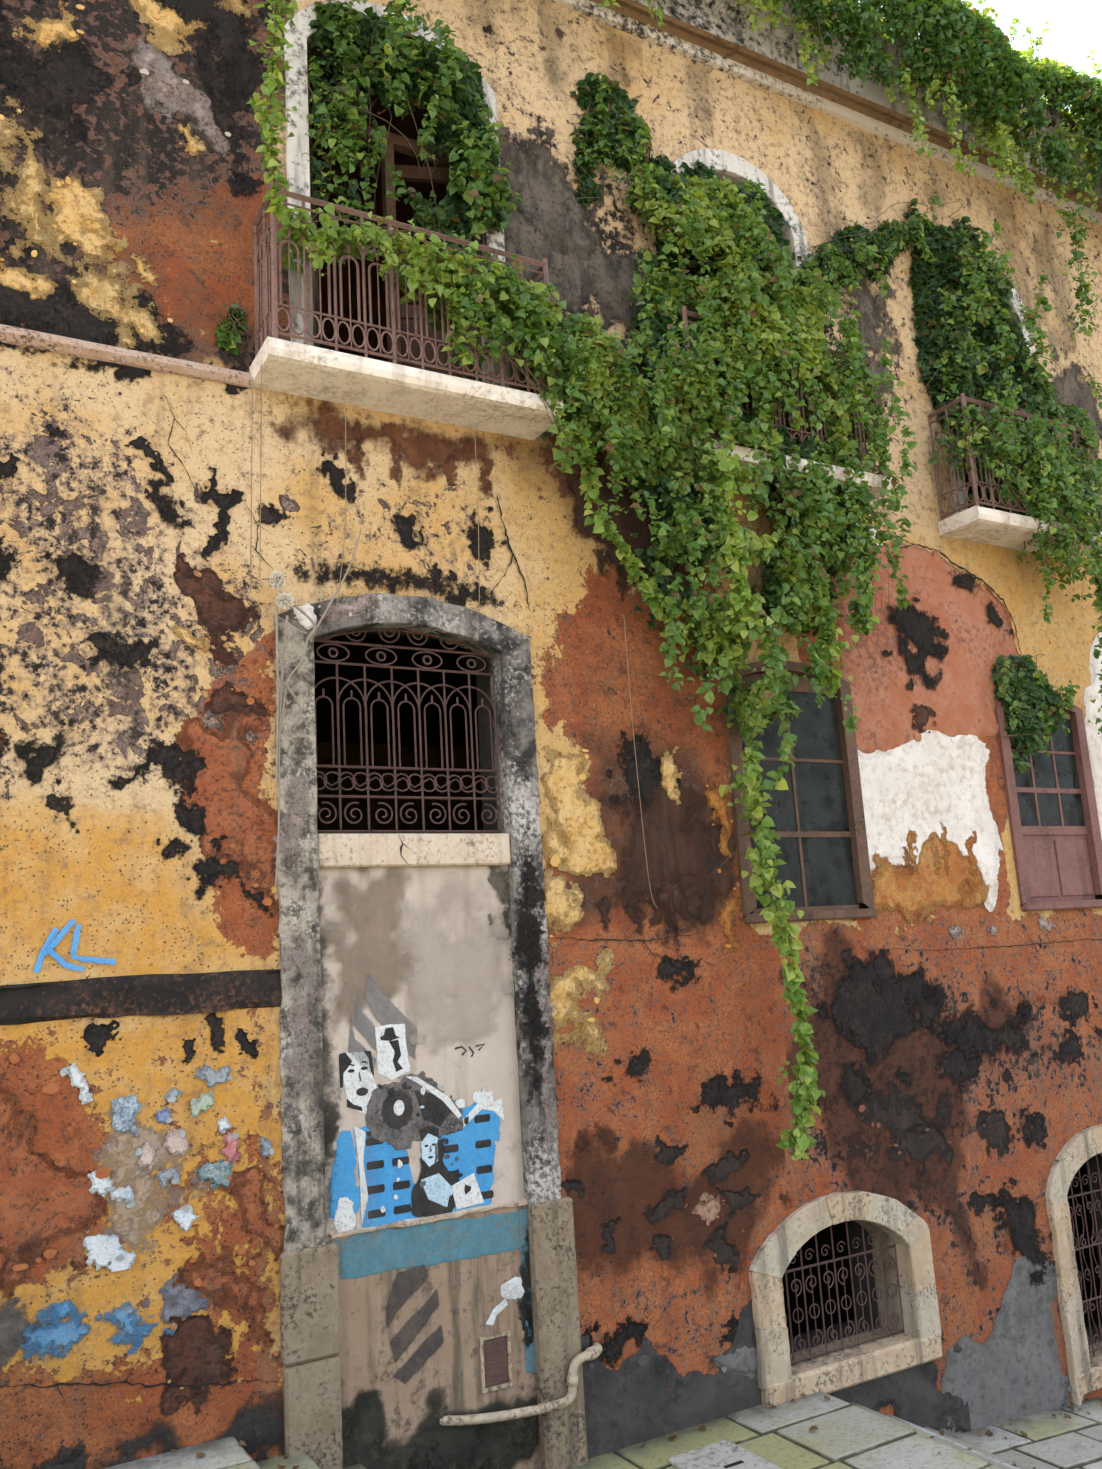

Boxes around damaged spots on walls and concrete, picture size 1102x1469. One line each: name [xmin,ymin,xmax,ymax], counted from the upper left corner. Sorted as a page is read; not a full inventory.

water stain [0,0,273,197]
peeling [0,96,173,349]
water stain [0,266,208,383]
spalling [0,452,31,479]
water stain [0,719,80,833]
water stain [107,737,274,918]
peeling [535,712,617,1146]
water stain [594,730,736,994]
rust [871,822,989,924]
peeling [857,703,1004,912]
peeling [1083,632,1102,838]
water stain [567,931,1102,1290]